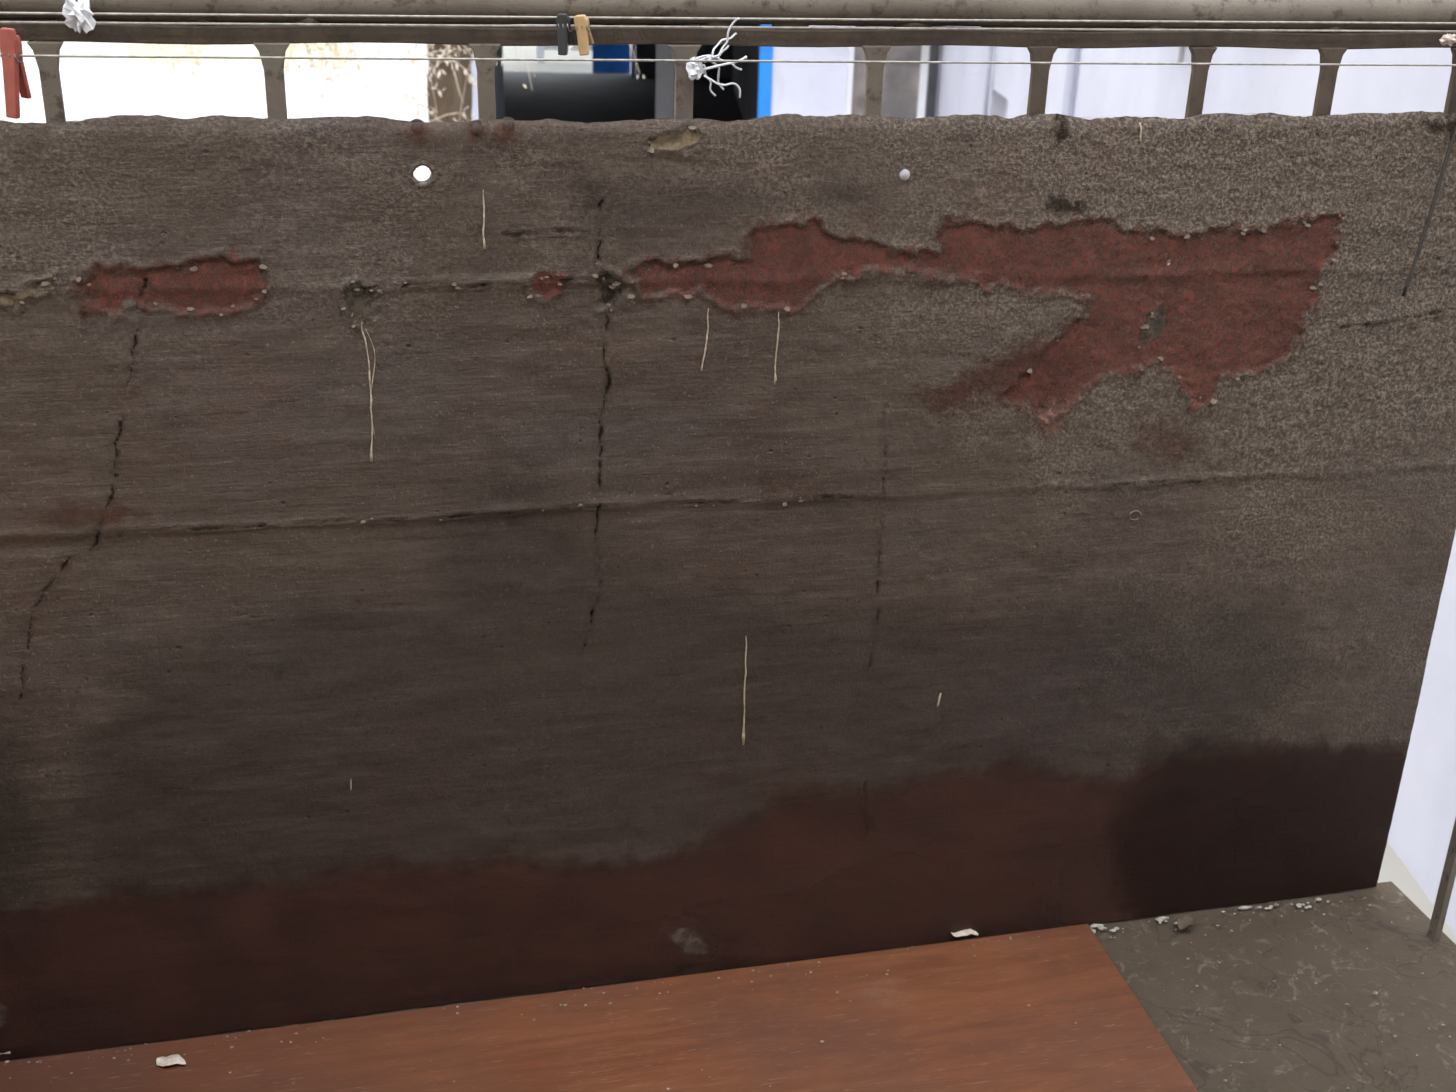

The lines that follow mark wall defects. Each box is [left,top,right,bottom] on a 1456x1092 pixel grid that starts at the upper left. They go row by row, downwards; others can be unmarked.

crack [127,278,147,383]
peeling [0,250,275,320]
peeling [592,190,1346,439]
crack [20,419,124,696]
crack [509,315,611,646]
water stain [1124,754,1404,914]
water stain [668,928,707,955]